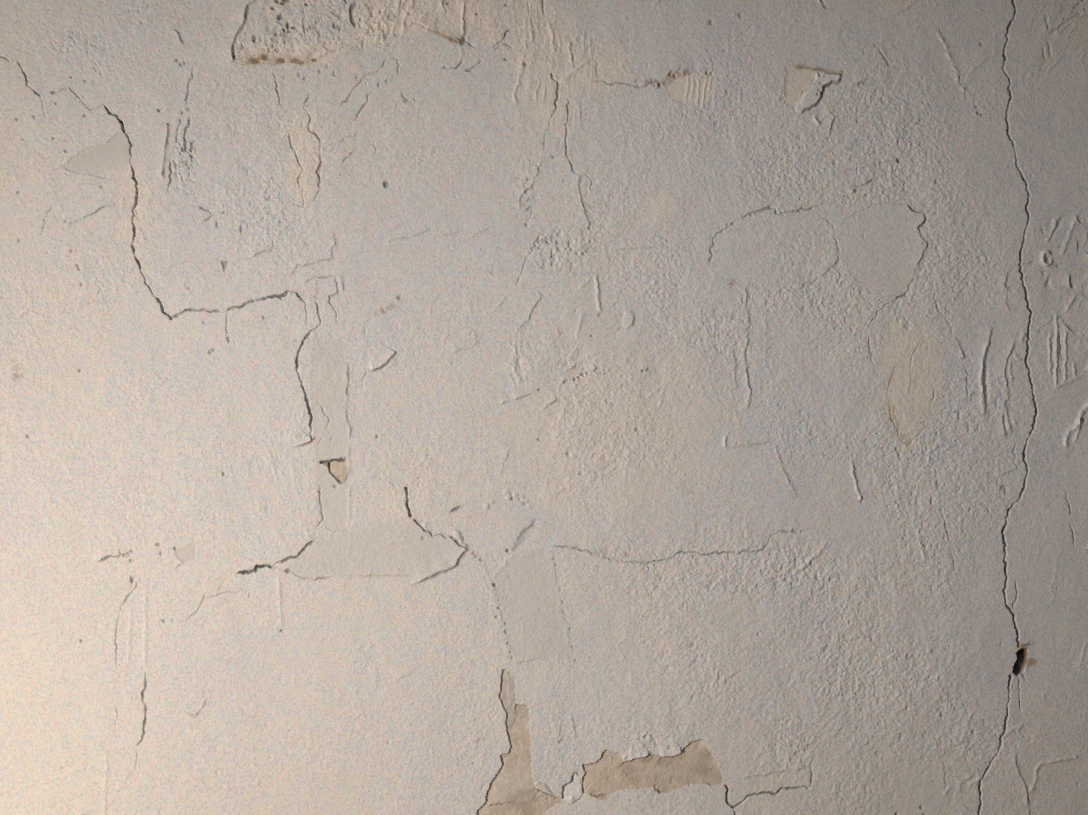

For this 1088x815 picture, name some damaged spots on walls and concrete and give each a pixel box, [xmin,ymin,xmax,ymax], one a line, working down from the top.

peeling [228,0,717,111]
spalling [784,62,846,135]
crack [0,54,345,448]
crack [886,289,972,448]
crack [1001,0,1040,649]
crack [184,483,354,633]
crack [370,475,497,588]
crack [549,527,831,579]
peeling [476,579,725,815]
crack [895,674,1028,815]